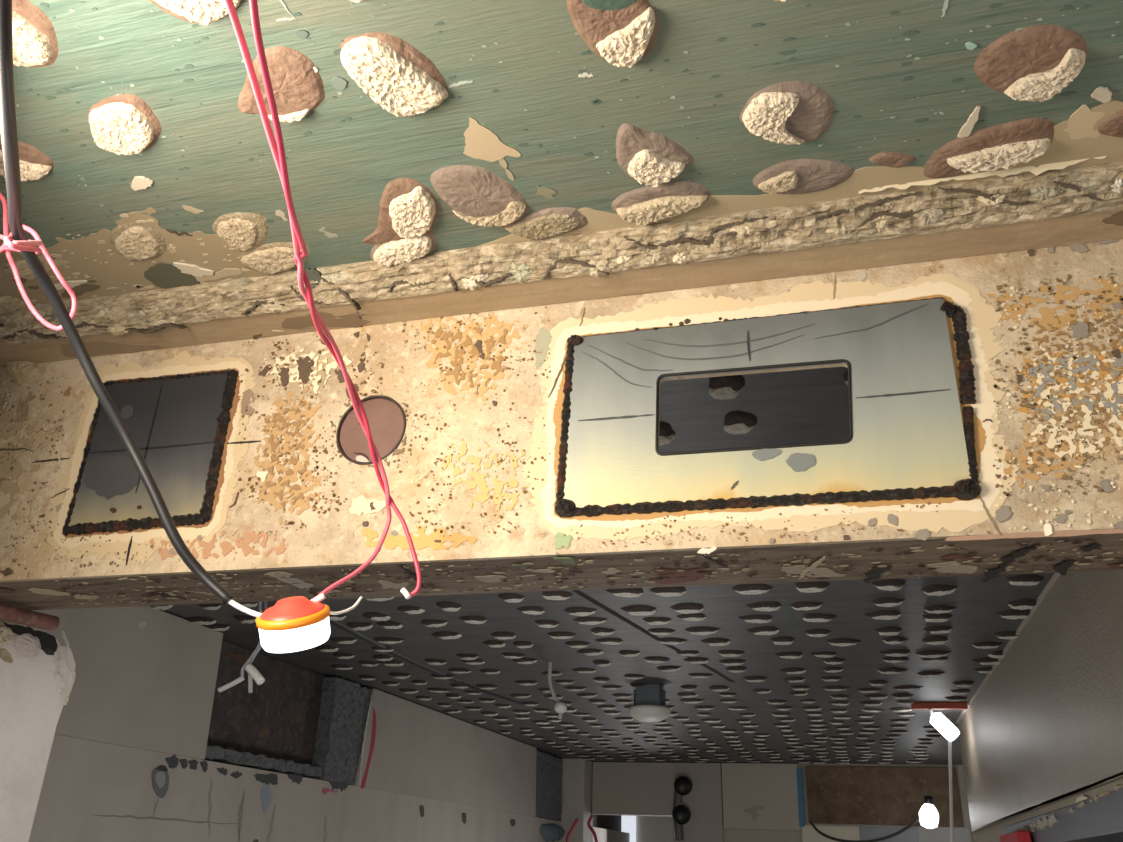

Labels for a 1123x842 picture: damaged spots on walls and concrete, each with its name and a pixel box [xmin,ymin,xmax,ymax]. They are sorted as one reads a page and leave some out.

crack [816,187,1034,233]
peeling [977,193,1007,207]
crack [624,216,766,250]
peeling [730,225,754,240]
spalling [144,262,214,289]
crack [387,273,512,292]
peeling [461,274,488,290]
crack [542,258,610,280]
peeling [588,253,692,278]
crack [241,272,363,327]
crack [0,322,188,339]
corrosion [987,269,1123,497]